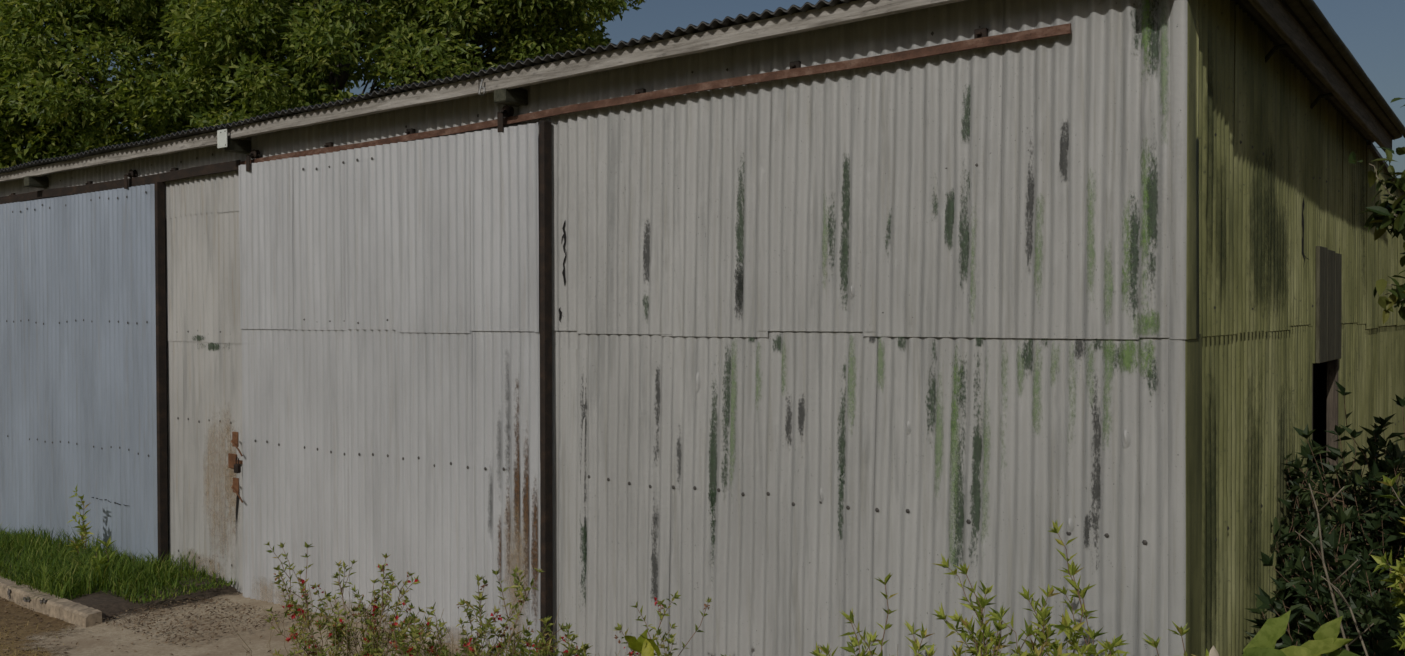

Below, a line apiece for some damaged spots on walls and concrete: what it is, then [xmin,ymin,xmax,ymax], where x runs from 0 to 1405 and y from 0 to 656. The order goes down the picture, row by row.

damp [1131,0,1168,112]
damp [1087,152,1158,317]
damp [1250,169,1285,299]
corrosion [497,384,538,616]
damp [838,346,855,539]
damp [925,341,988,578]
damp [1002,350,1059,422]
damp [1084,346,1113,545]
damp [1205,421,1217,647]